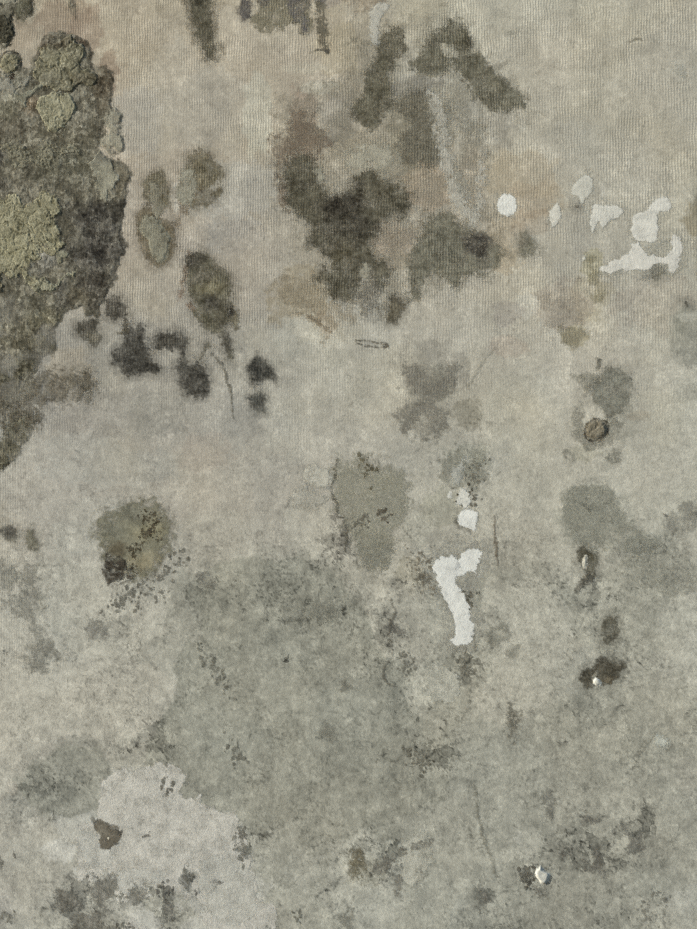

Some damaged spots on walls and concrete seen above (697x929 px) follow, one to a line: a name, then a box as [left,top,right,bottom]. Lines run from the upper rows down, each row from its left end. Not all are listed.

leakage [239,0,330,54]
mould [352,26,438,167]
mould [409,19,526,112]
mould [0,0,239,469]
leakage [267,112,500,331]
peeling [549,202,561,227]
peeling [571,175,623,232]
peeling [599,197,697,279]
mould [247,356,276,412]
peeling [425,456,492,652]